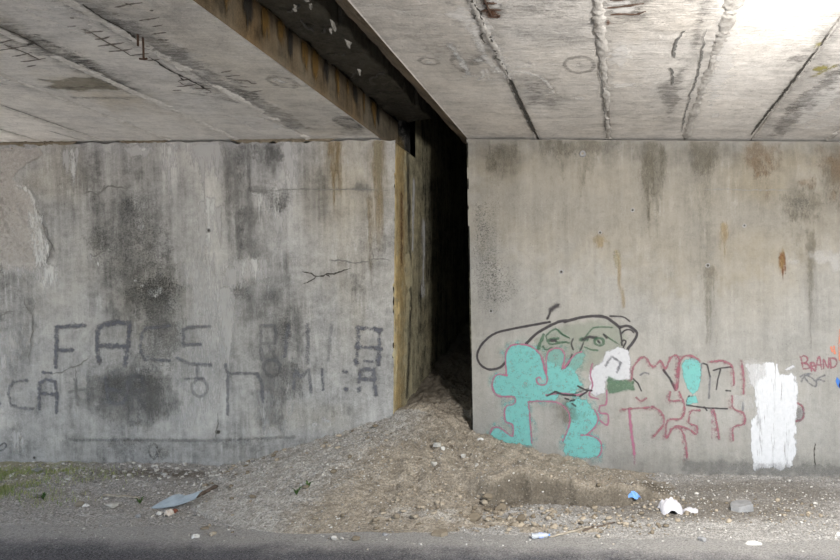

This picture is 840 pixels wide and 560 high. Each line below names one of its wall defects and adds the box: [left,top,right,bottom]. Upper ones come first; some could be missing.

crack [470,0,536,135]
crack [598,62,606,133]
crack [669,29,707,131]
crack [751,33,830,135]
spalling [0,141,77,278]
crack [303,252,390,284]
crack [0,293,36,367]